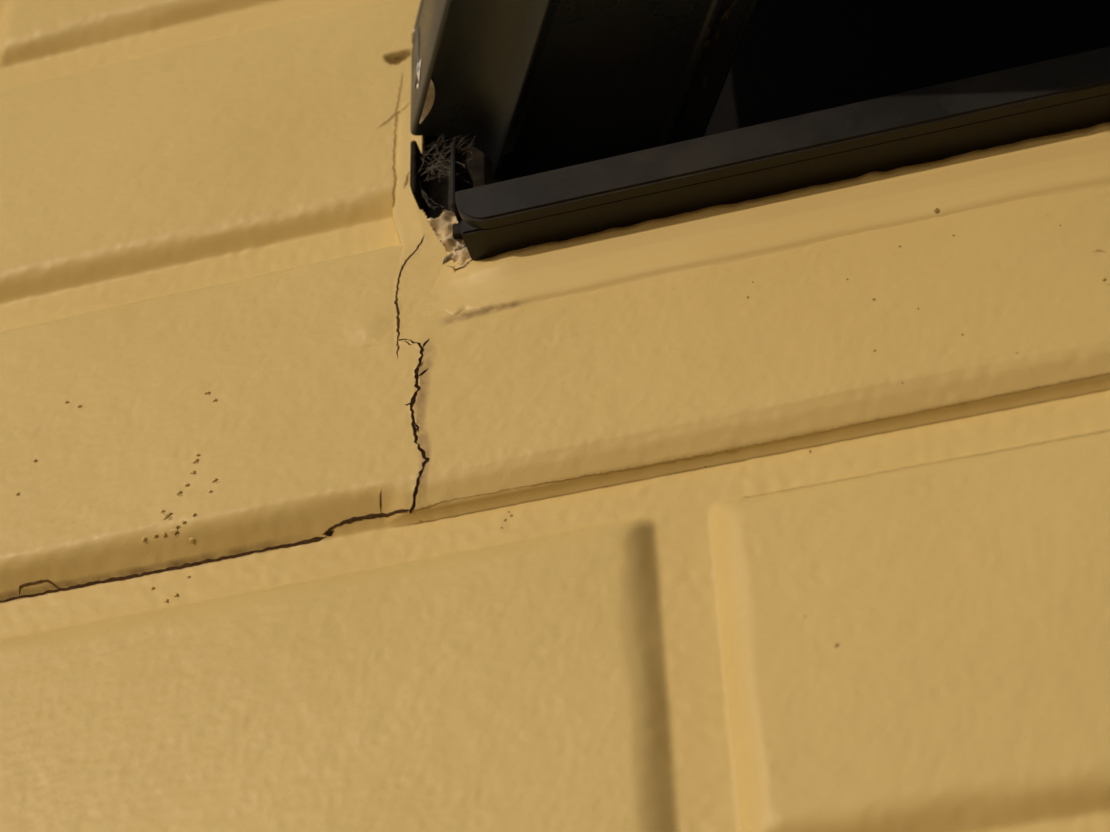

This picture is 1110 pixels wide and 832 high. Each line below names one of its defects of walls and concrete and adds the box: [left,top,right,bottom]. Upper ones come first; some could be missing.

crack [377,72,411,207]
crack [0,235,1110,603]